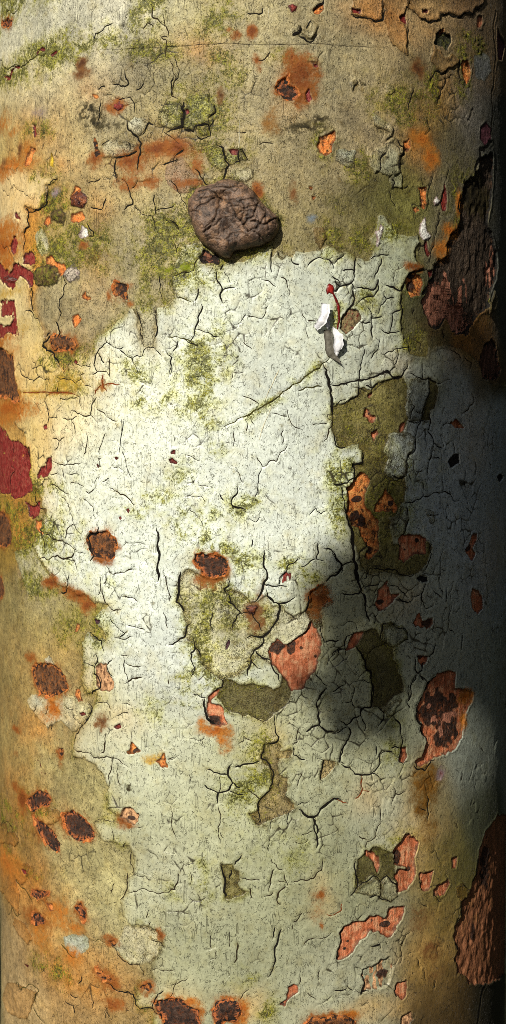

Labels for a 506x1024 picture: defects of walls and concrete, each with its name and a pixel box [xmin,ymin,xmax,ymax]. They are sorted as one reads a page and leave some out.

rust [283,49,321,108]
rust [116,139,202,191]
crack [3,6,270,784]
rust [86,529,121,565]
crack [95,0,496,999]
peeling [331,377,438,611]
rust [25,654,69,720]
peeling [178,552,332,727]
peeling [345,613,433,717]
peeling [399,670,473,767]
peeling [337,814,506,986]
crack [61,939,187,1019]